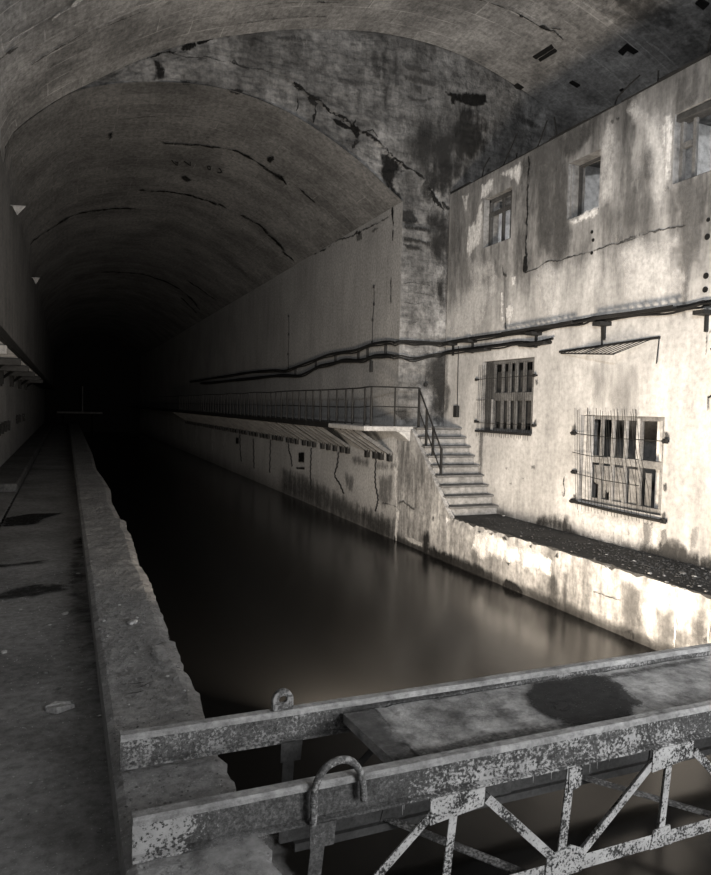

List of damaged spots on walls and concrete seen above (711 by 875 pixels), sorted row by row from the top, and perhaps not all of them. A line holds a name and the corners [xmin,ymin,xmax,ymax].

crack [480,0,563,40]
crack [120,115,315,203]
crack [294,82,450,210]
damp [409,110,486,196]
crack [30,189,294,261]
crack [314,207,394,255]
crack [502,156,685,329]
damp [423,532,566,603]
damp [537,517,578,535]
damp [640,529,711,570]
damp [622,584,642,623]
damp [526,657,706,725]